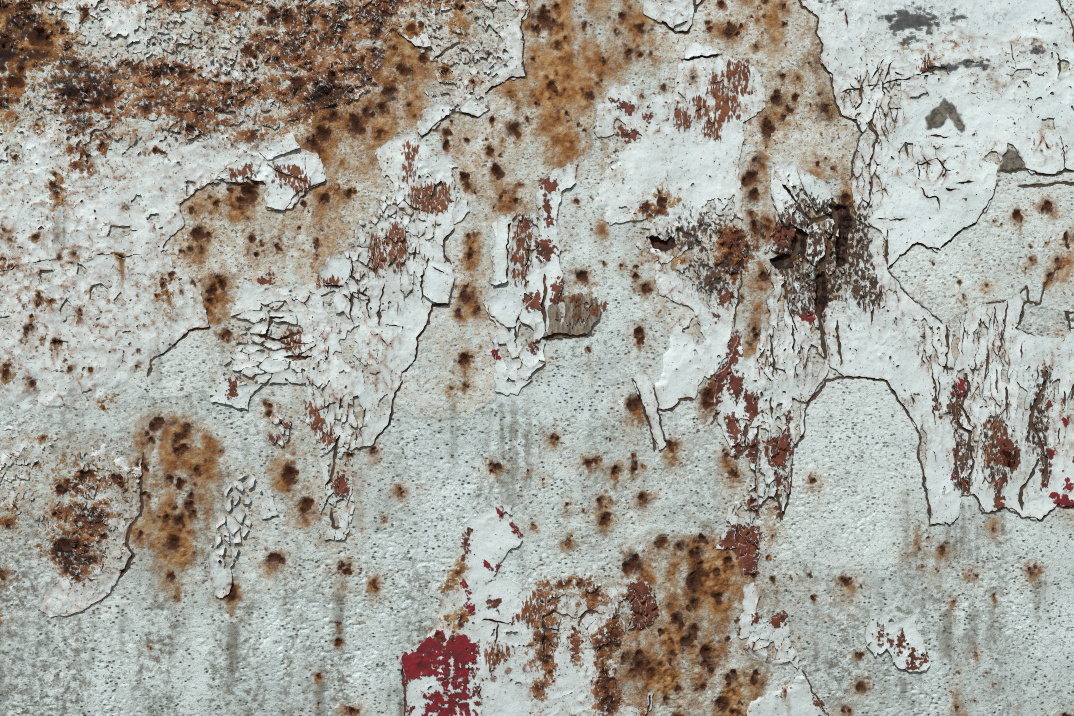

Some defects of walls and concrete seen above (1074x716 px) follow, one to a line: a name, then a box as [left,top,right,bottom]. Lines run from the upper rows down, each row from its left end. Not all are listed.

crack [661,0,723,61]
rust [0,0,660,272]
peeling [0,0,1074,571]
rust [707,46,838,357]
crack [733,0,1074,526]
rust [0,413,223,601]
peeling [209,473,278,598]
peeling [396,504,662,716]
rust [488,527,793,716]
crack [632,379,720,452]
crack [801,669,829,716]
peeling [865,614,931,672]